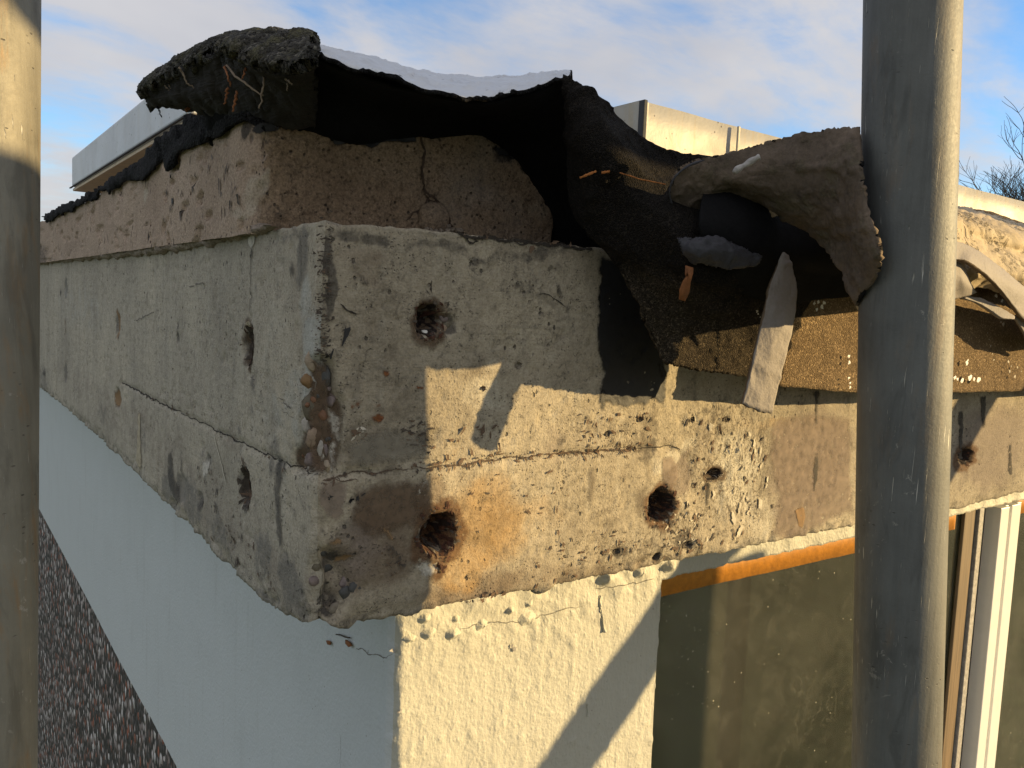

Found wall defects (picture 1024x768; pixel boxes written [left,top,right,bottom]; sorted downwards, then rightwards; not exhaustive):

crack [406,136,592,254]
spalling [296,327,367,473]
crack [122,382,682,488]
leakage [320,482,430,535]
rust [414,501,462,573]
peeling [515,412,774,594]
rust [645,482,680,529]